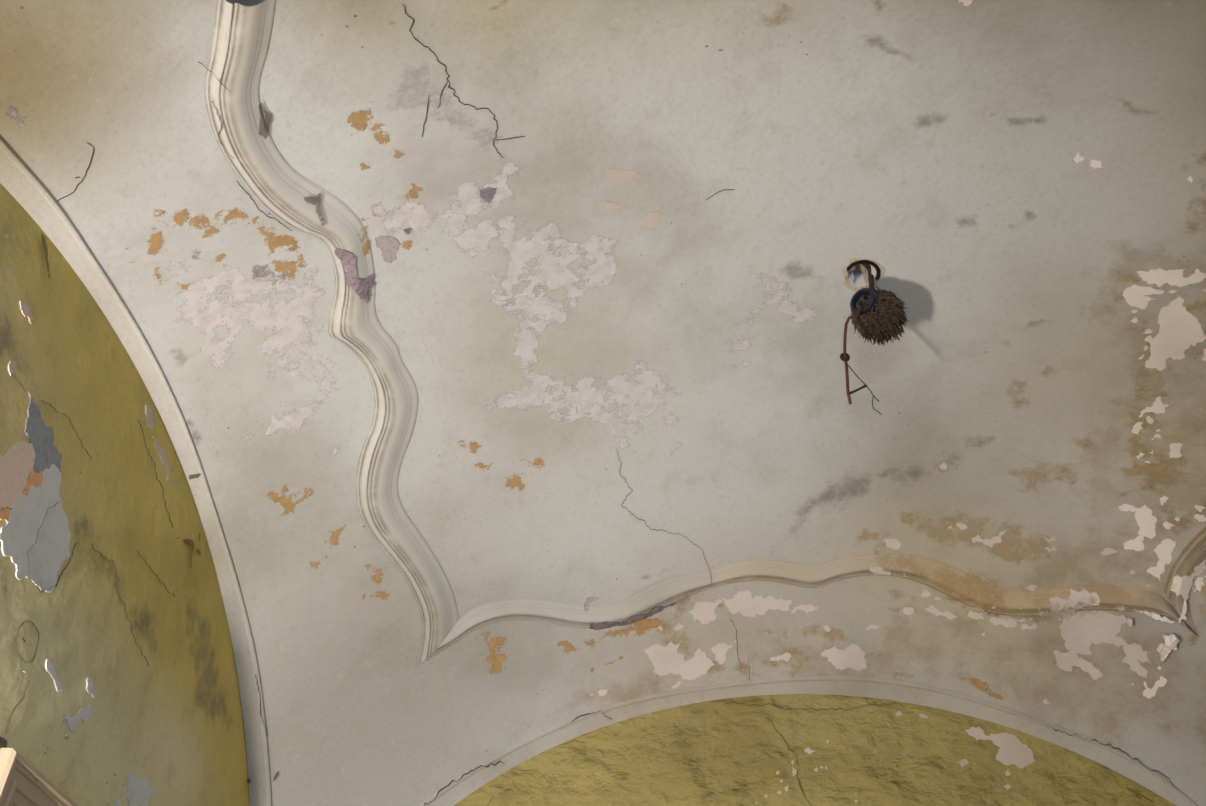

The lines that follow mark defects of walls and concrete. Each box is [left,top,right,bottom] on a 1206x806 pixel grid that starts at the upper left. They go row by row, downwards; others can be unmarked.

crack [402,4,525,158]
flaking render [334,247,375,303]
peeling [1123,268,1206,371]
peeling [1132,396,1182,464]
peeling [0,391,71,592]
crack [6,620,40,733]
crack [27,503,175,666]
crack [424,761,533,805]
crack [559,710,611,746]
peeling [584,590,818,689]
peeling [903,496,1206,699]
crack [1047,725,1179,801]